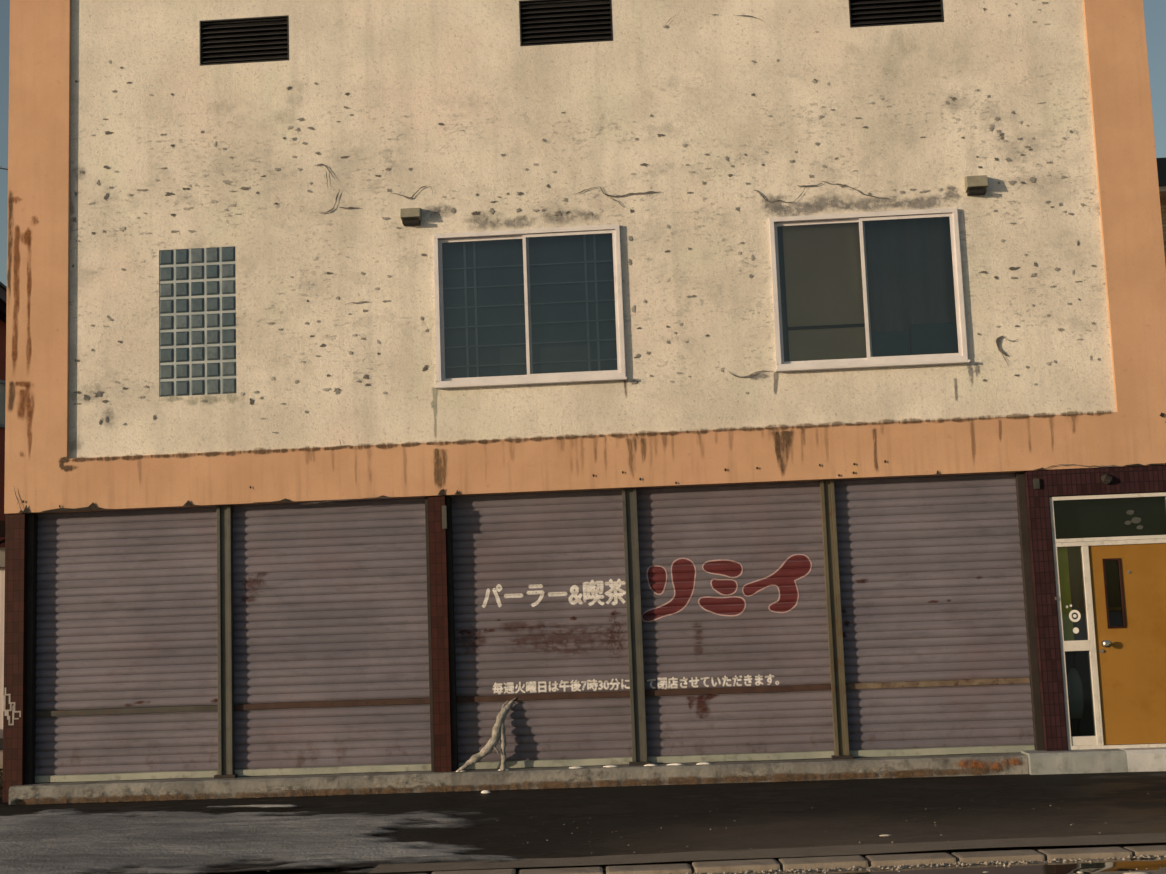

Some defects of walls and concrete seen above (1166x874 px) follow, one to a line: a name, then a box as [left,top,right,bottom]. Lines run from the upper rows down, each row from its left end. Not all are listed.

crack [315,164,355,214]
crack [392,185,433,199]
crack [572,186,656,208]
crack [755,181,889,203]
leakage [764,190,959,216]
leakage [473,217,525,227]
corrosion [12,217,38,364]
corrosion [16,382,34,452]